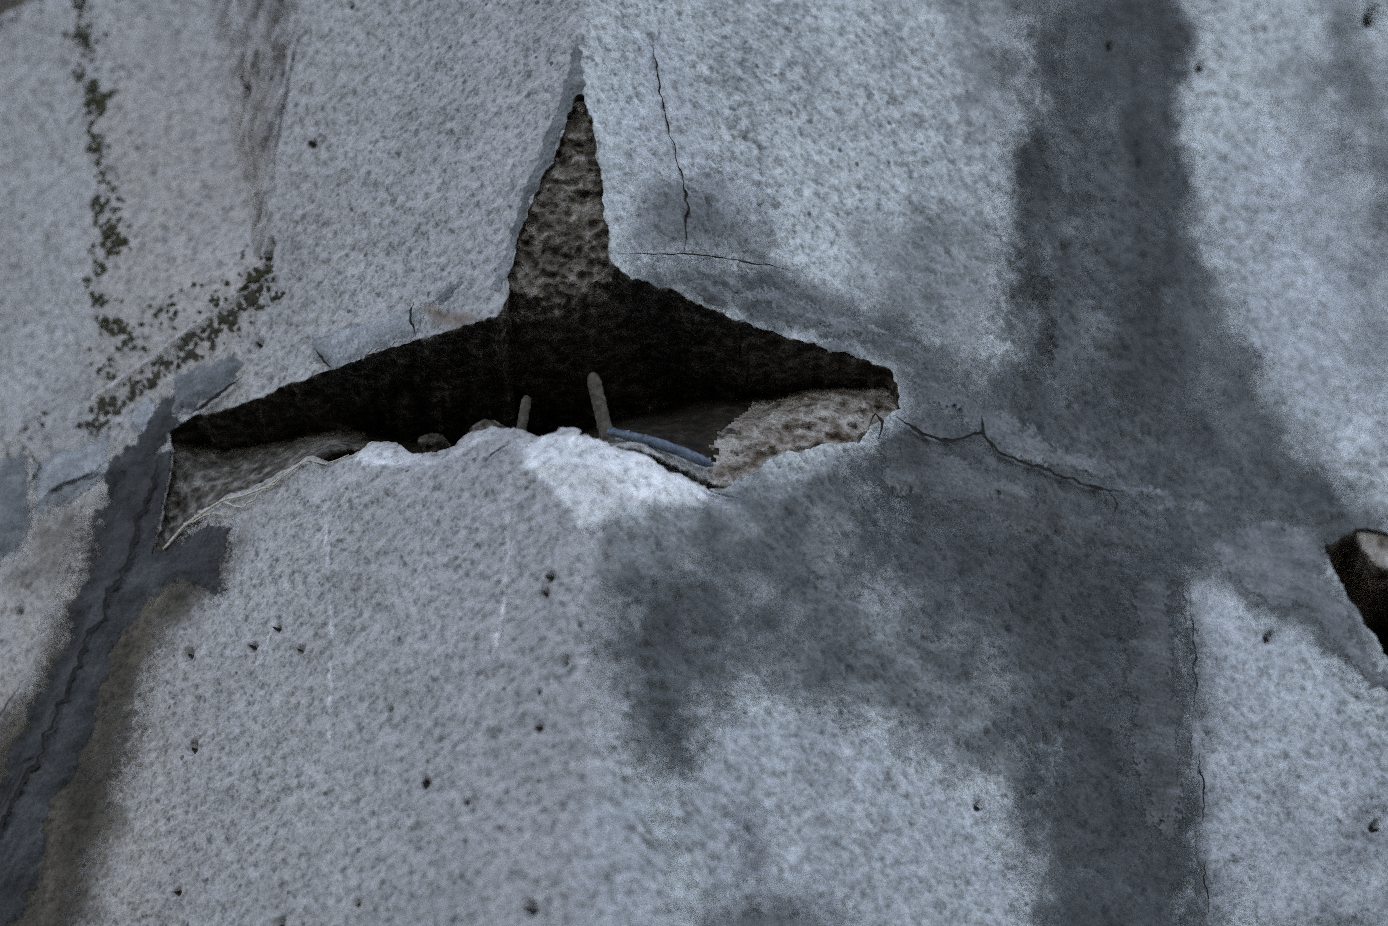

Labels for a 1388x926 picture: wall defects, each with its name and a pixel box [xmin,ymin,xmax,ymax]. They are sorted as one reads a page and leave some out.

crack [621,45,789,270]
spalling [469,101,897,490]
spalling [156,430,456,551]
leakage [354,448,411,466]
leakage [523,0,1384,926]
crack [869,413,1125,517]
spalling [1343,530,1388,657]
leakage [0,536,236,926]